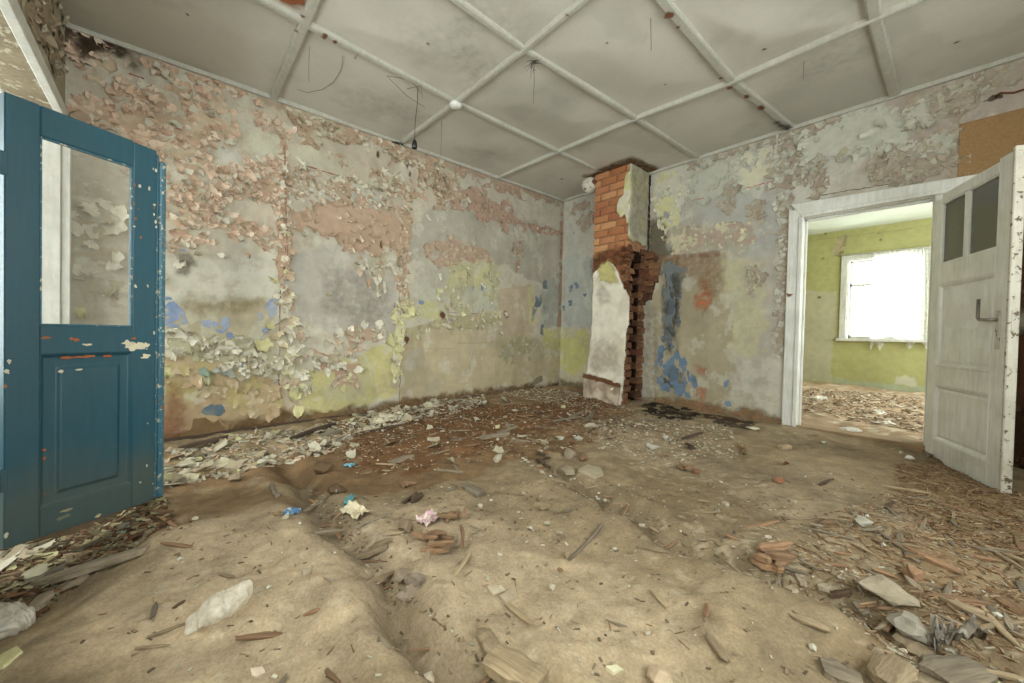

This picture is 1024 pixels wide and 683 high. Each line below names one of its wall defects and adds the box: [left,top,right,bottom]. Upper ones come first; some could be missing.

peeling [21,0,1024,423]
spalling [180,417,229,437]